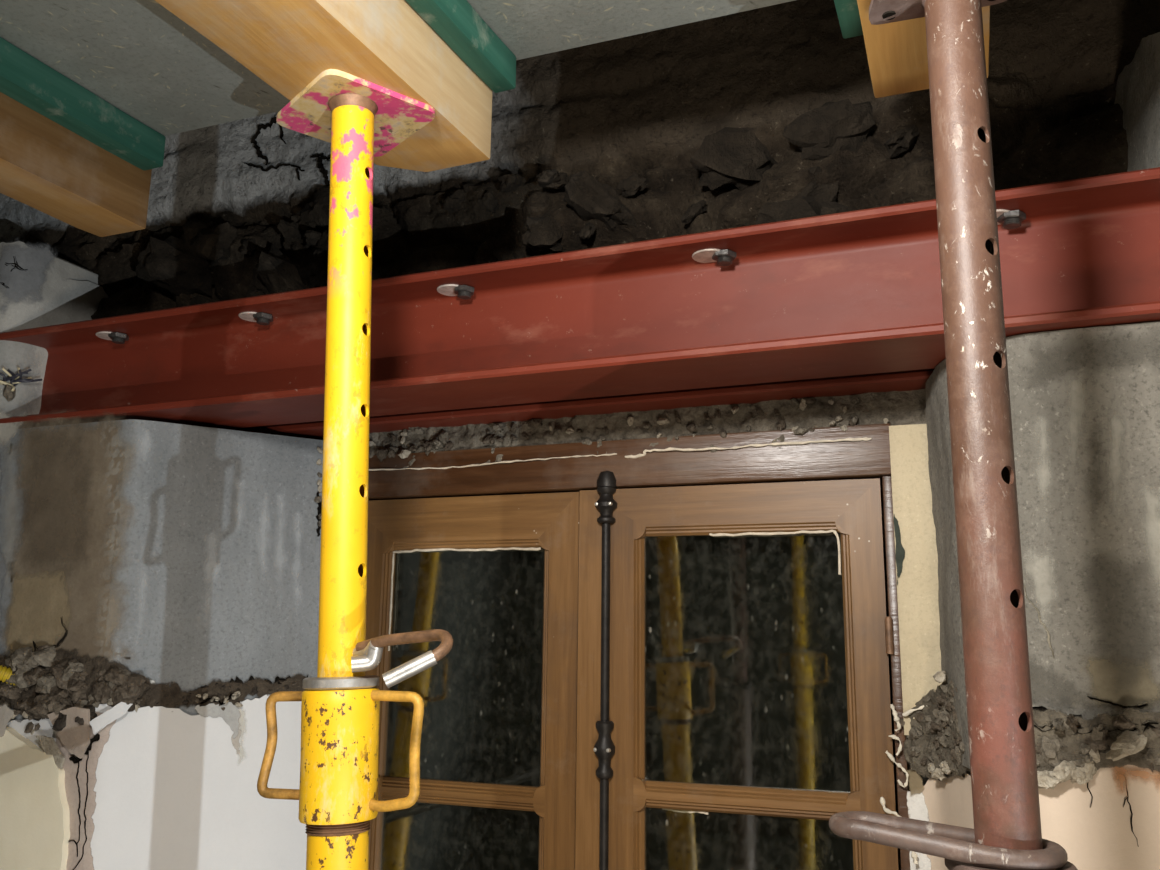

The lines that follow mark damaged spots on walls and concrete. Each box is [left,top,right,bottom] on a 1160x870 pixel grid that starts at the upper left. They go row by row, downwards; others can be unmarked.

crack [243,117,331,186]
peeling [0,412,23,443]
spalling [0,645,308,870]
spalling [880,671,971,821]
spalling [1033,708,1160,790]
crack [68,750,89,870]
crack [1123,775,1139,847]
peeling [910,851,931,870]